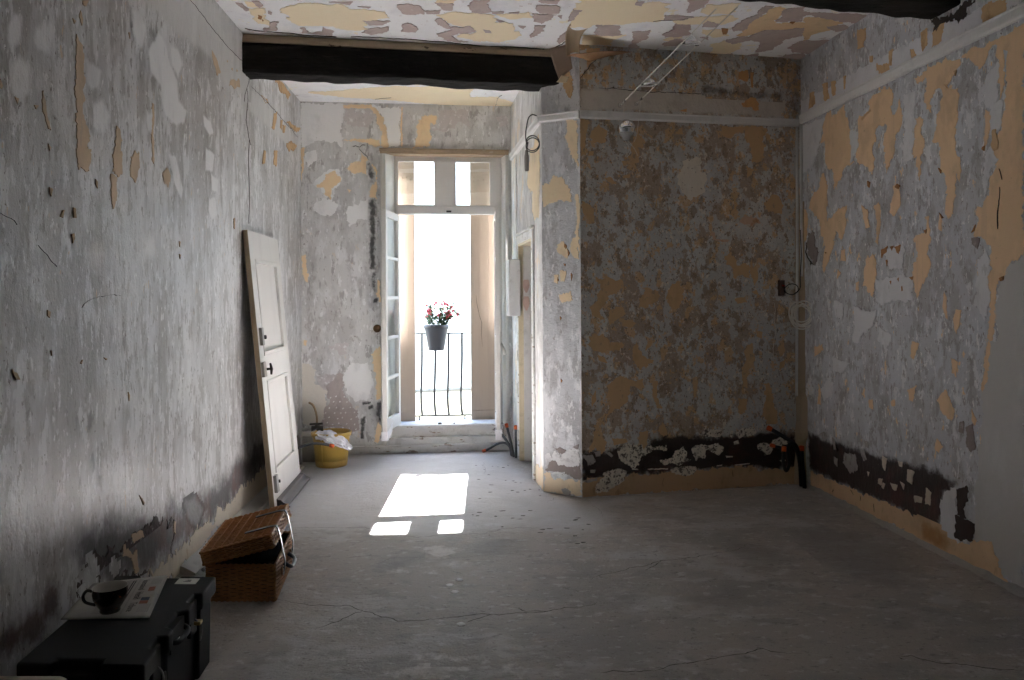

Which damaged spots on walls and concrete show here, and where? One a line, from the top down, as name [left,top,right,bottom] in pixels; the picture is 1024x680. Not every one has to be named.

peeling [72,0,91,172]
peeling [110,103,171,209]
crack [191,1,565,208]
flaking render [235,0,1024,587]
damp [0,426,265,671]
flaking render [76,467,267,598]
crack [288,601,589,628]